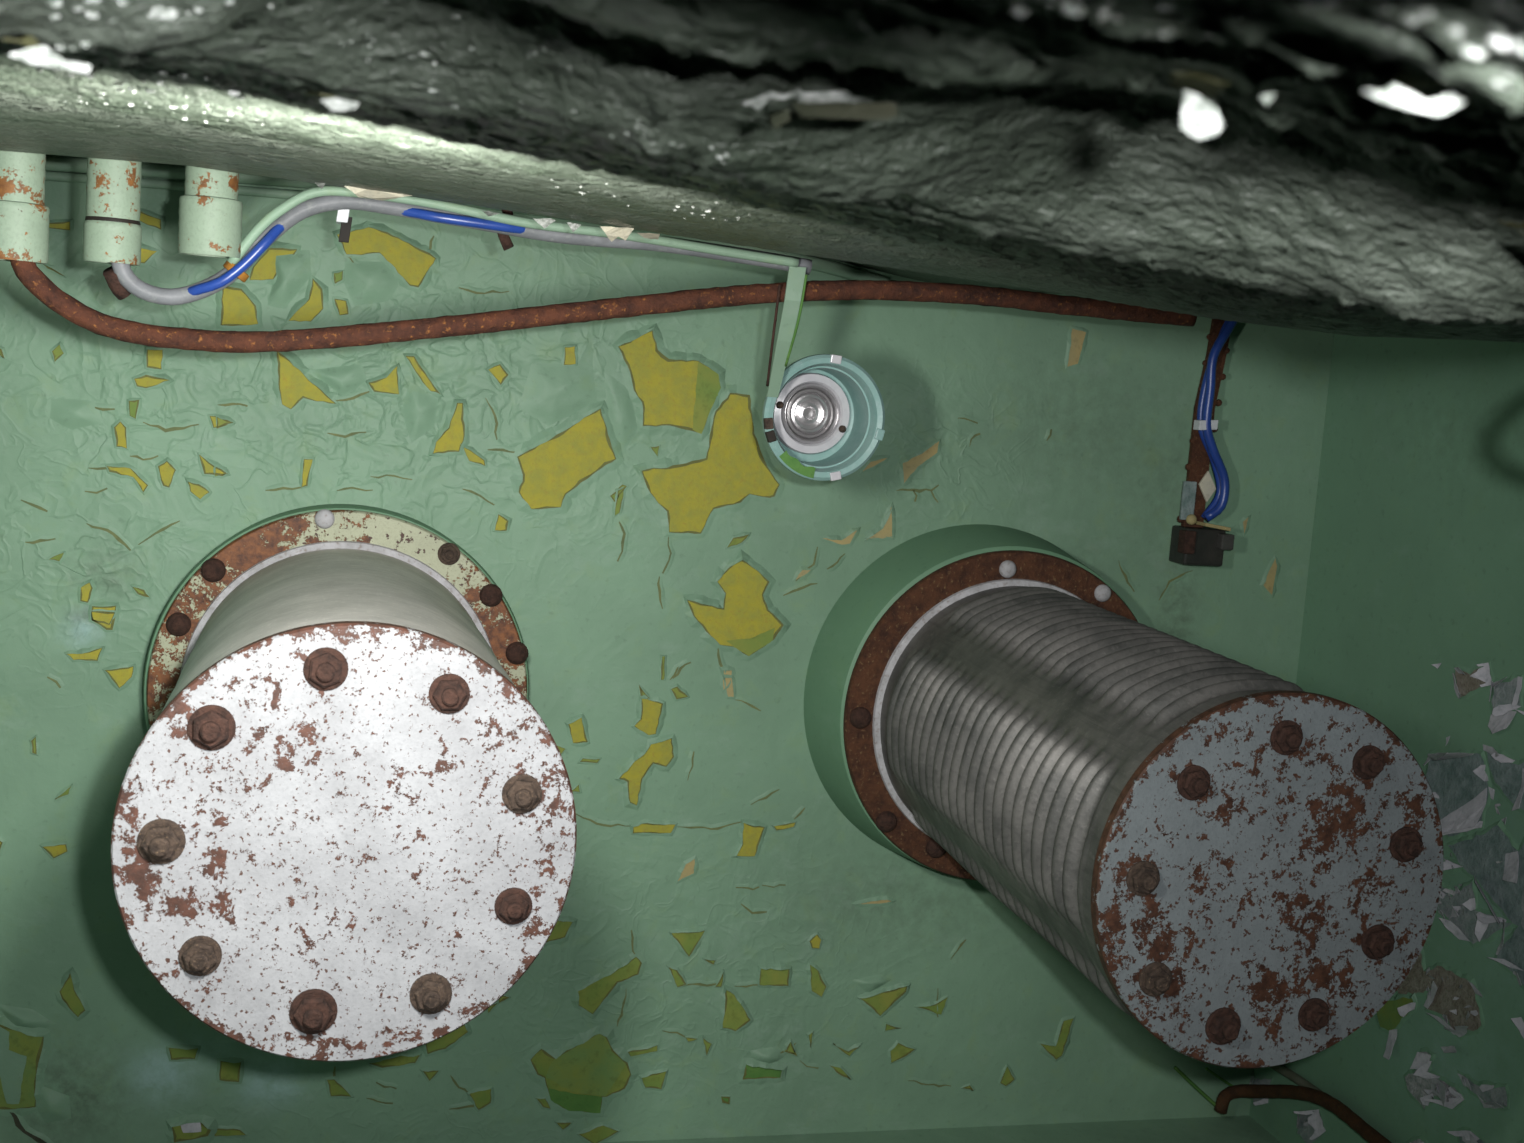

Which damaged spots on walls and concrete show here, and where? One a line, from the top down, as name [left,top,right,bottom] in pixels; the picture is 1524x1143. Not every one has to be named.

peeling [215,241,301,331]
peeling [285,220,441,327]
peeling [104,346,231,503]
peeling [270,352,341,414]
peeling [365,353,488,468]
peeling [492,323,815,540]
peeling [683,532,813,699]
peeling [614,655,690,836]
peeling [1423,661,1524,990]
peeling [544,916,578,947]
peeling [523,952,669,1143]
peeling [666,927,754,1056]